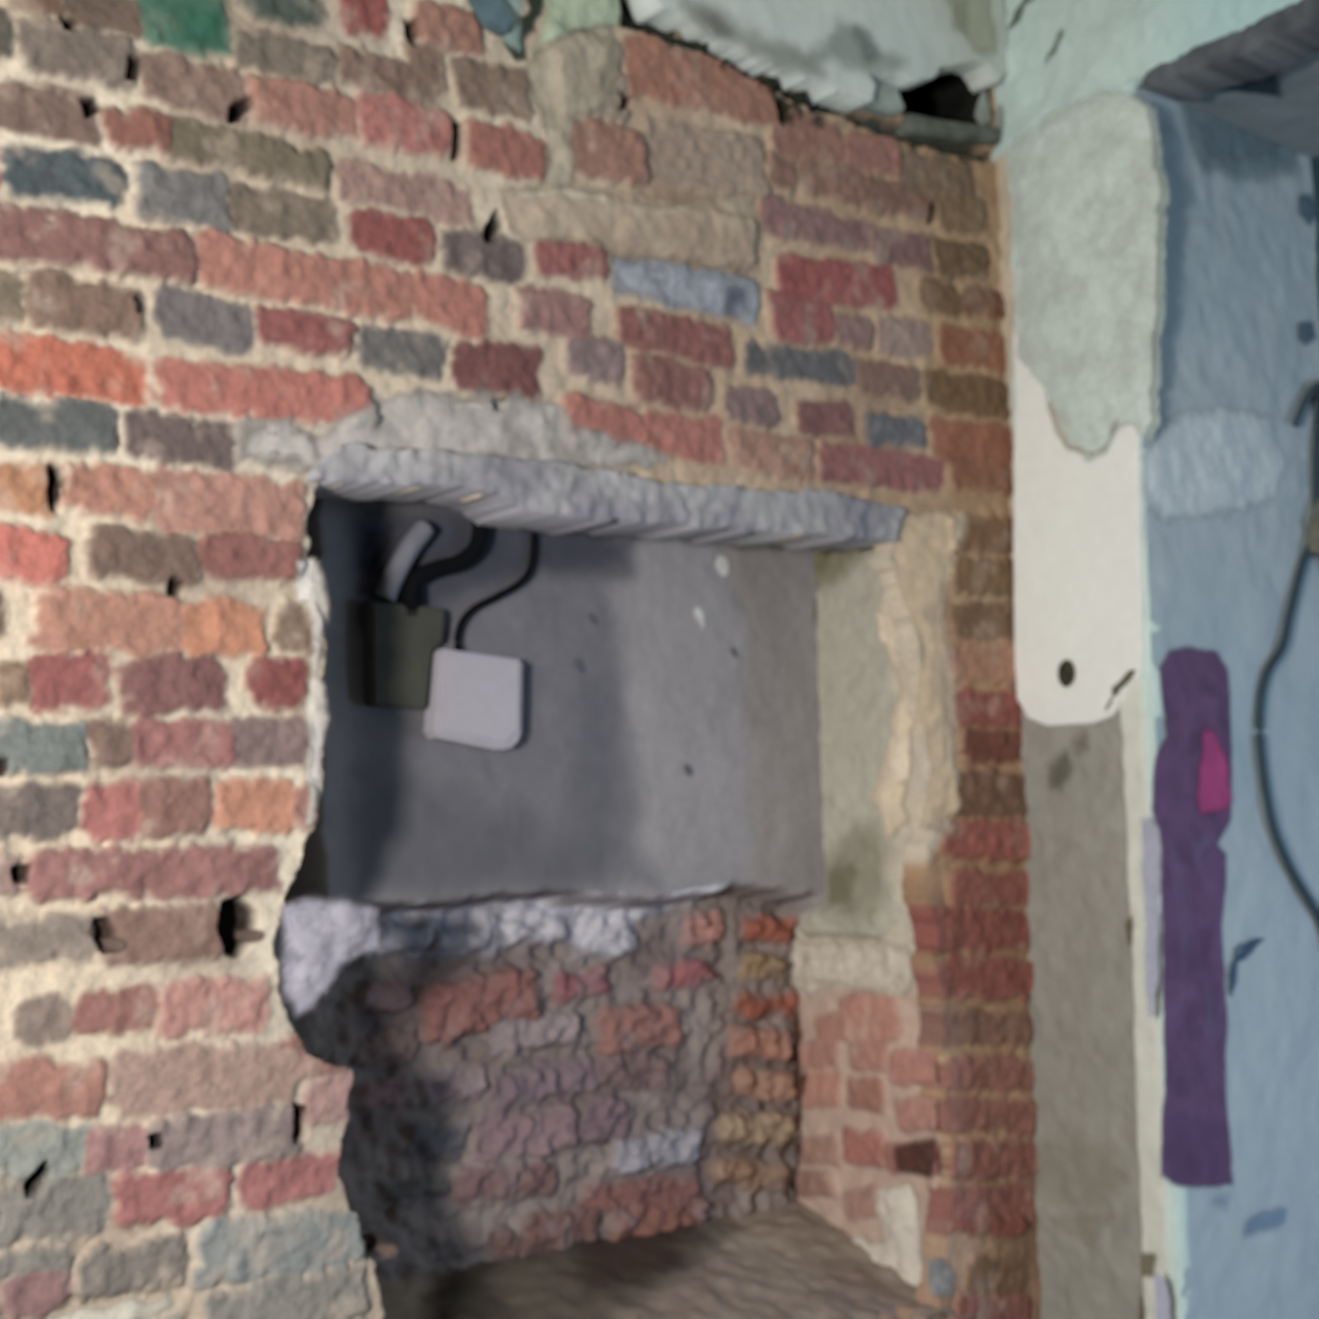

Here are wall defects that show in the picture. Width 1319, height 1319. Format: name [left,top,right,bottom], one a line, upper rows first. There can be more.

peeling [887,728,910,783]
peeling [663,883,729,903]
spalling [217,898,263,955]
peeling [282,899,378,1013]